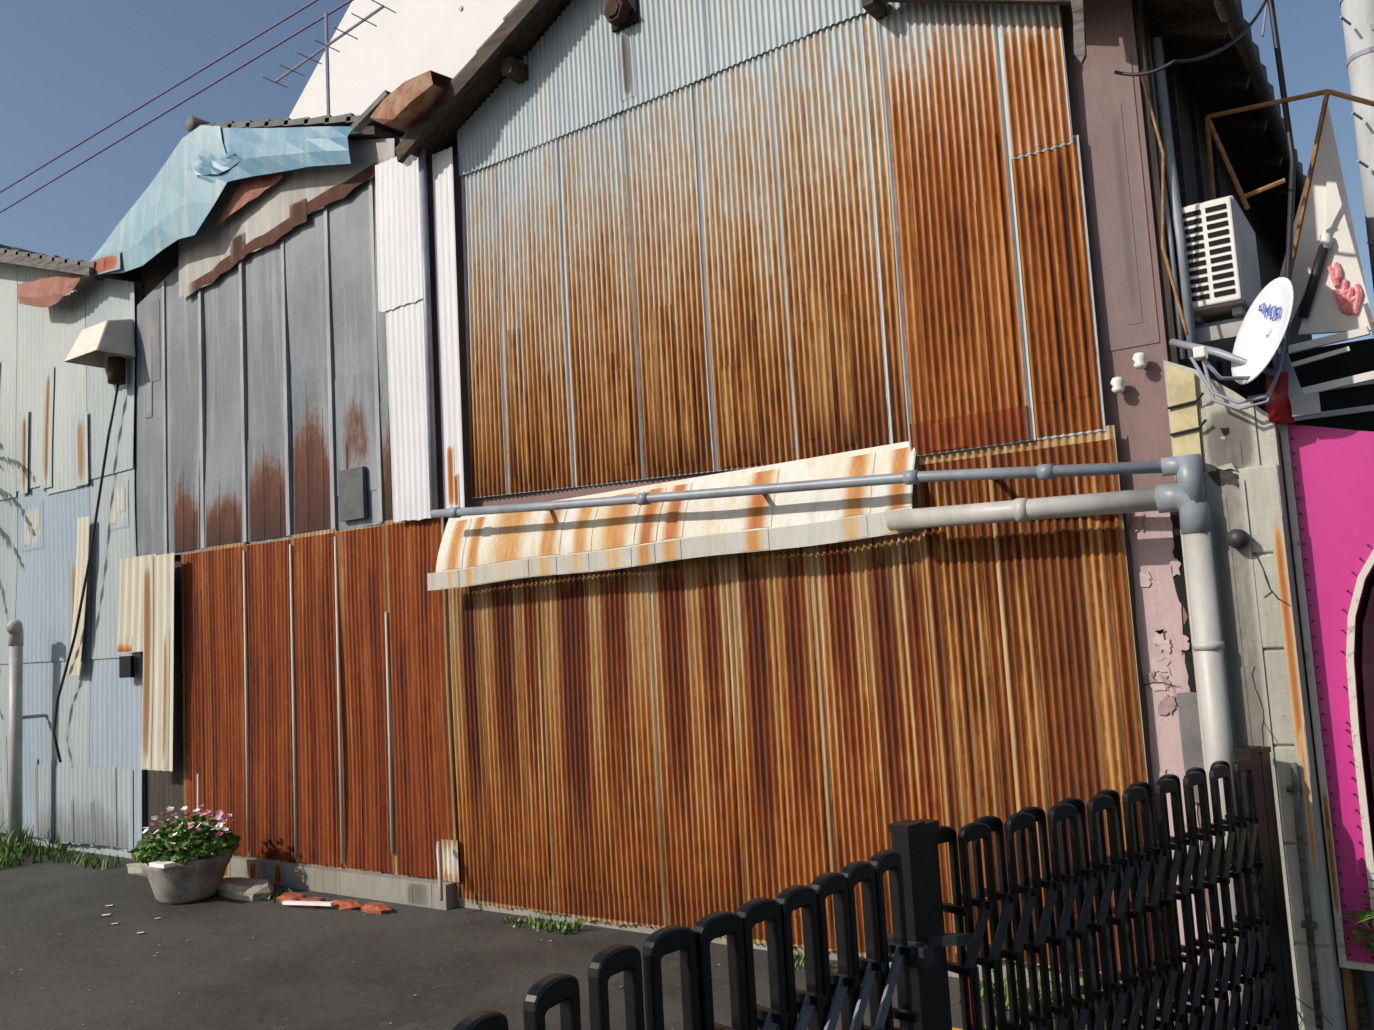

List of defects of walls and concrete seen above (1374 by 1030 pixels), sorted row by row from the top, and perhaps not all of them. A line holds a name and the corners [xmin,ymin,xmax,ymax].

corrosion [19,366,54,495]
corrosion [73,412,88,487]
corrosion [117,2,1146,969]
peeling [1126,511,1201,858]
corrosion [1269,513,1342,920]
corrosion [1093,882,1156,978]
peeling [1165,875,1212,969]